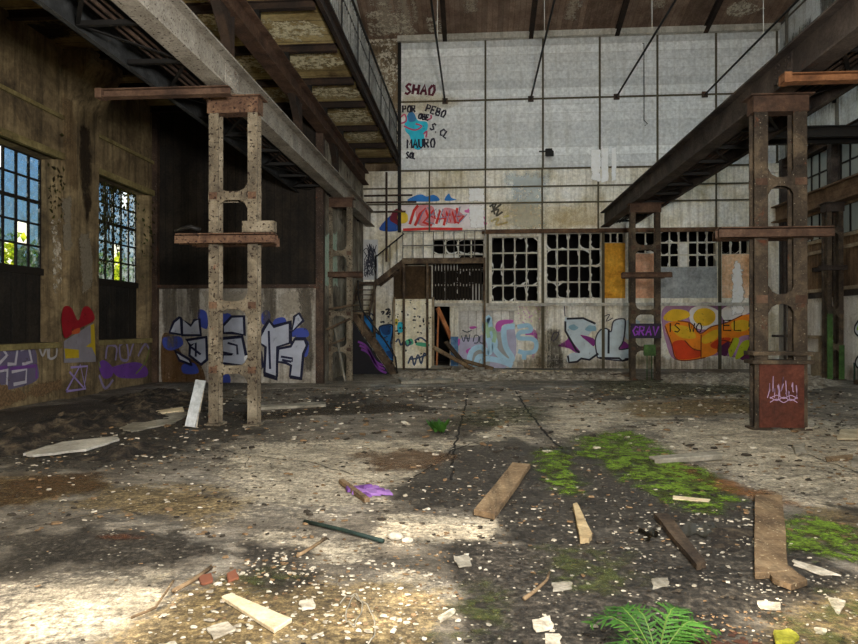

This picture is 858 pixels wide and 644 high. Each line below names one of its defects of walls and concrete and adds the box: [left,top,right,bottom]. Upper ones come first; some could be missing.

crack [407,392,564,482]